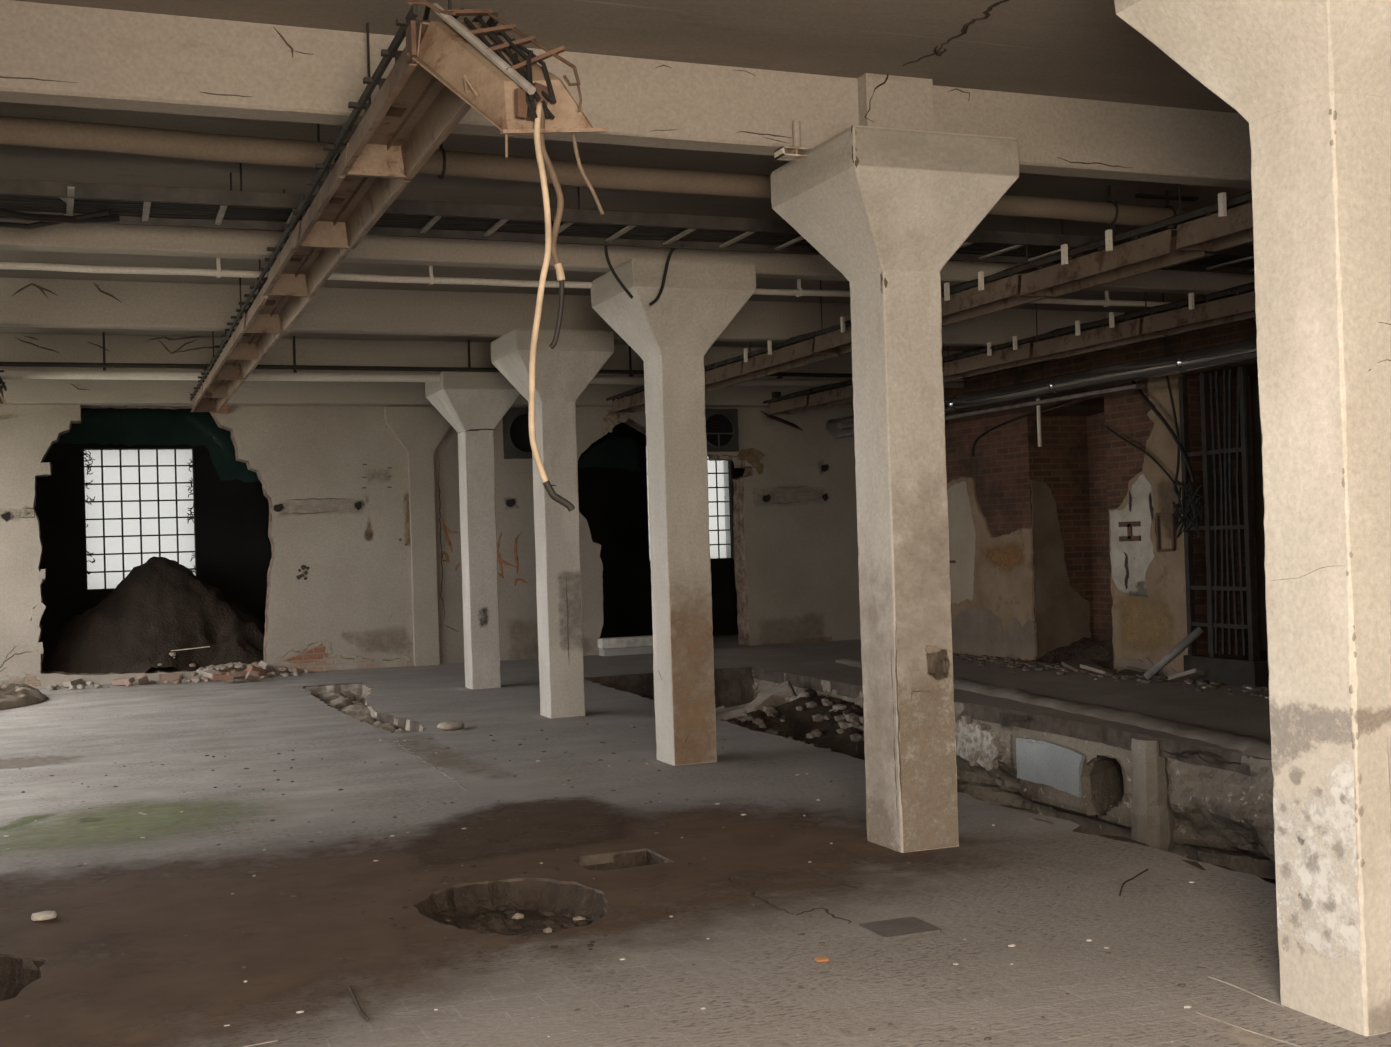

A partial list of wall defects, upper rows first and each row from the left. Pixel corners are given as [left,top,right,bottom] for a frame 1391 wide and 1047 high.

crack [865,0,1010,122]
peeling [925,608,1037,680]
peeling [1270,685,1360,784]
spalling [1340,773,1364,823]
peeling [1278,817,1318,868]
crack [673,858,851,924]
peeling [1292,893,1334,921]